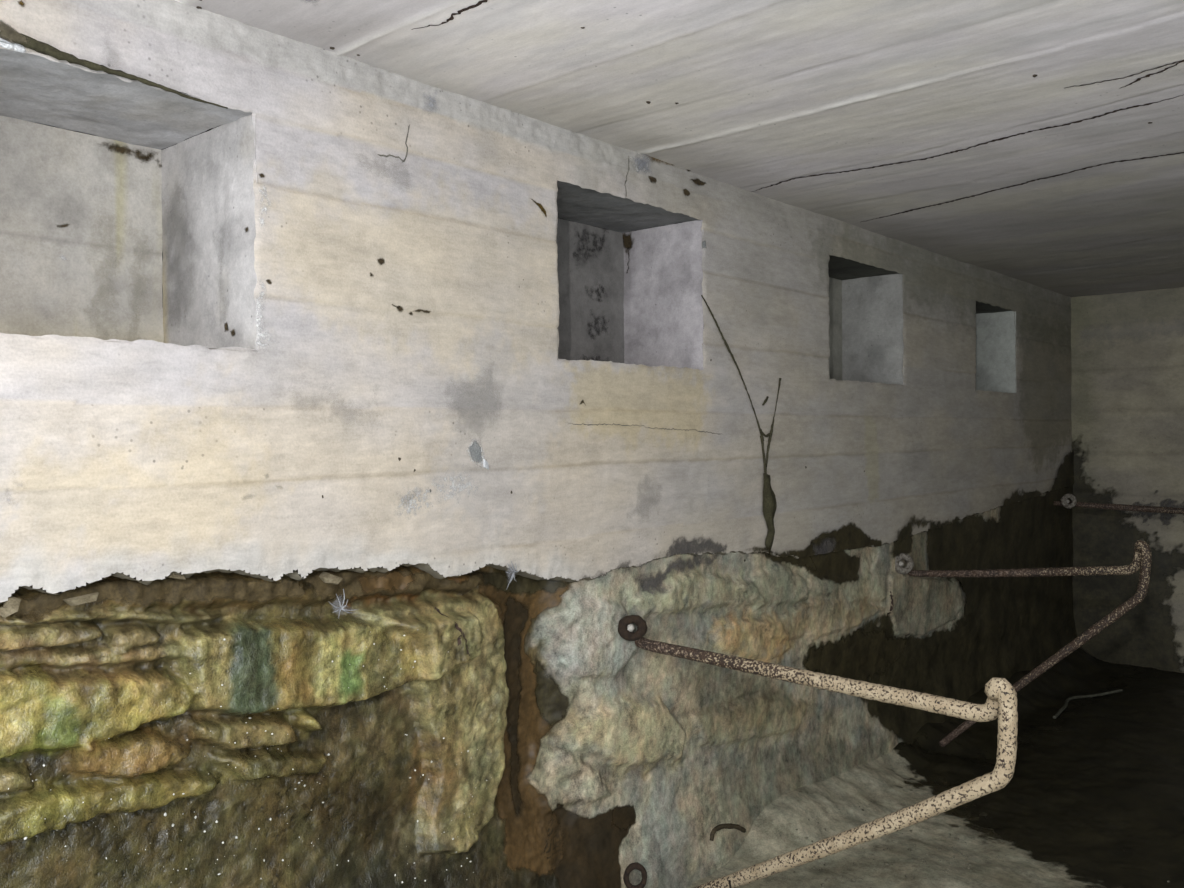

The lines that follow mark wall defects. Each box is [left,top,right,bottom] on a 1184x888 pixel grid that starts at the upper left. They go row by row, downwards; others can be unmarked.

crack [411,0,487,30]
spalling [0,38,25,53]
water stain [585,538,727,594]
spalling [0,567,483,623]
water stain [744,440,1184,888]